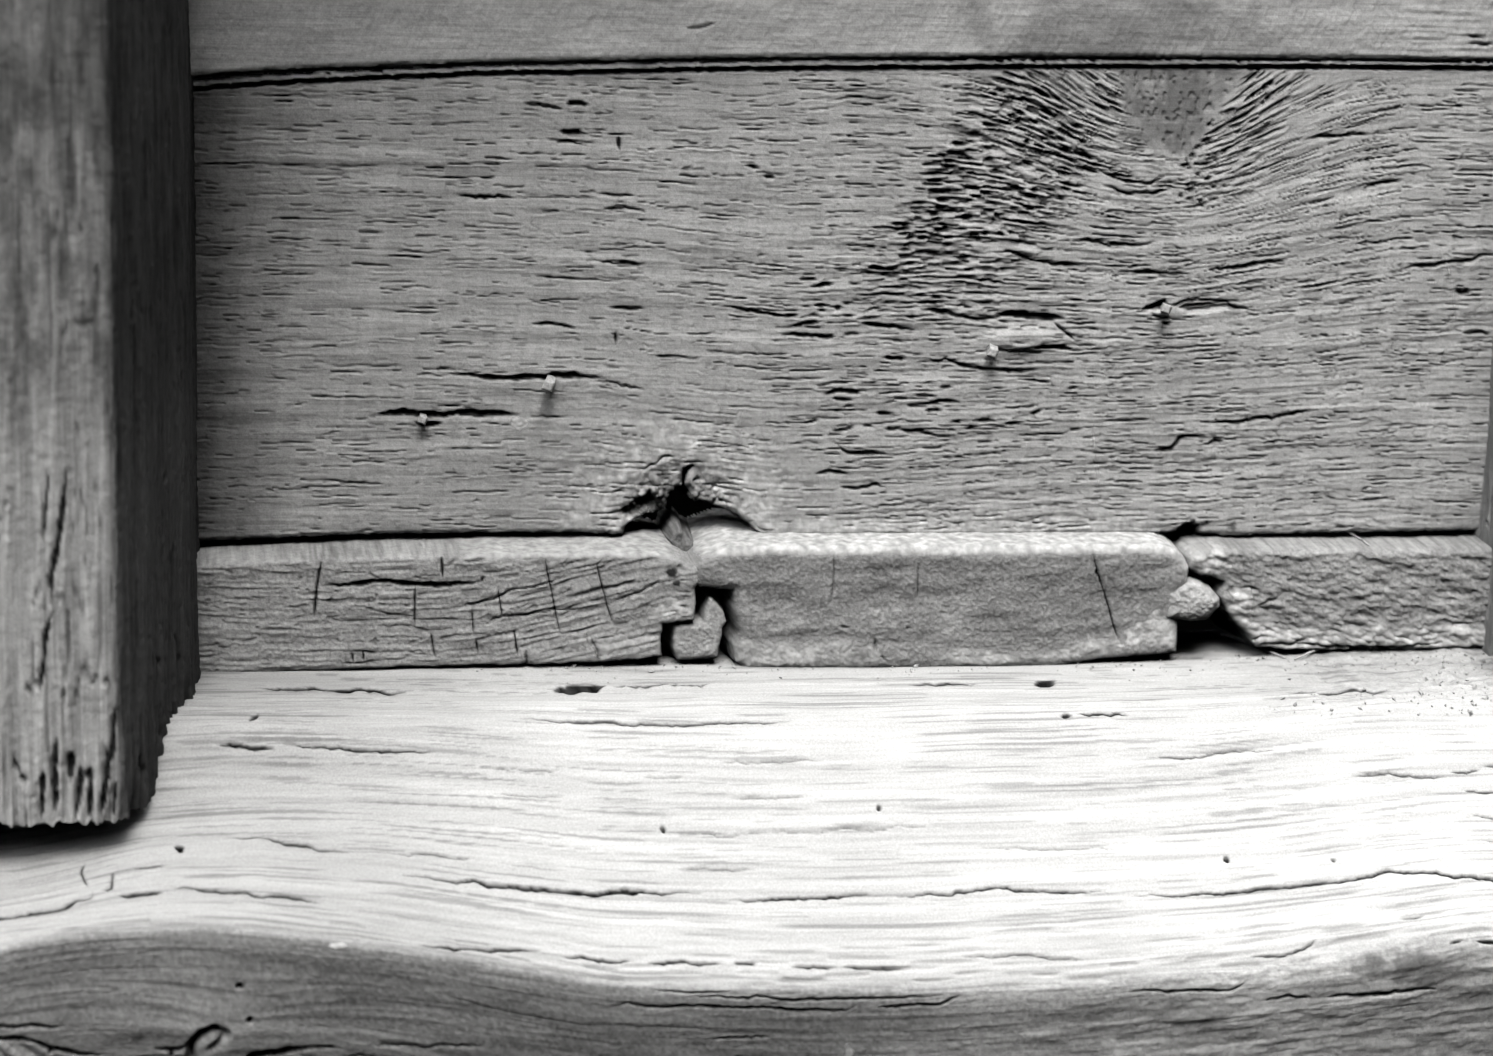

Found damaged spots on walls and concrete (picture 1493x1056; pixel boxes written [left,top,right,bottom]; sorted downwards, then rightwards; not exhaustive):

crack [1362,766,1493,820]
crack [248,838,323,853]
crack [418,854,671,898]
crack [1161,871,1493,898]
crack [0,1023,96,1055]
crack [158,1024,470,1056]